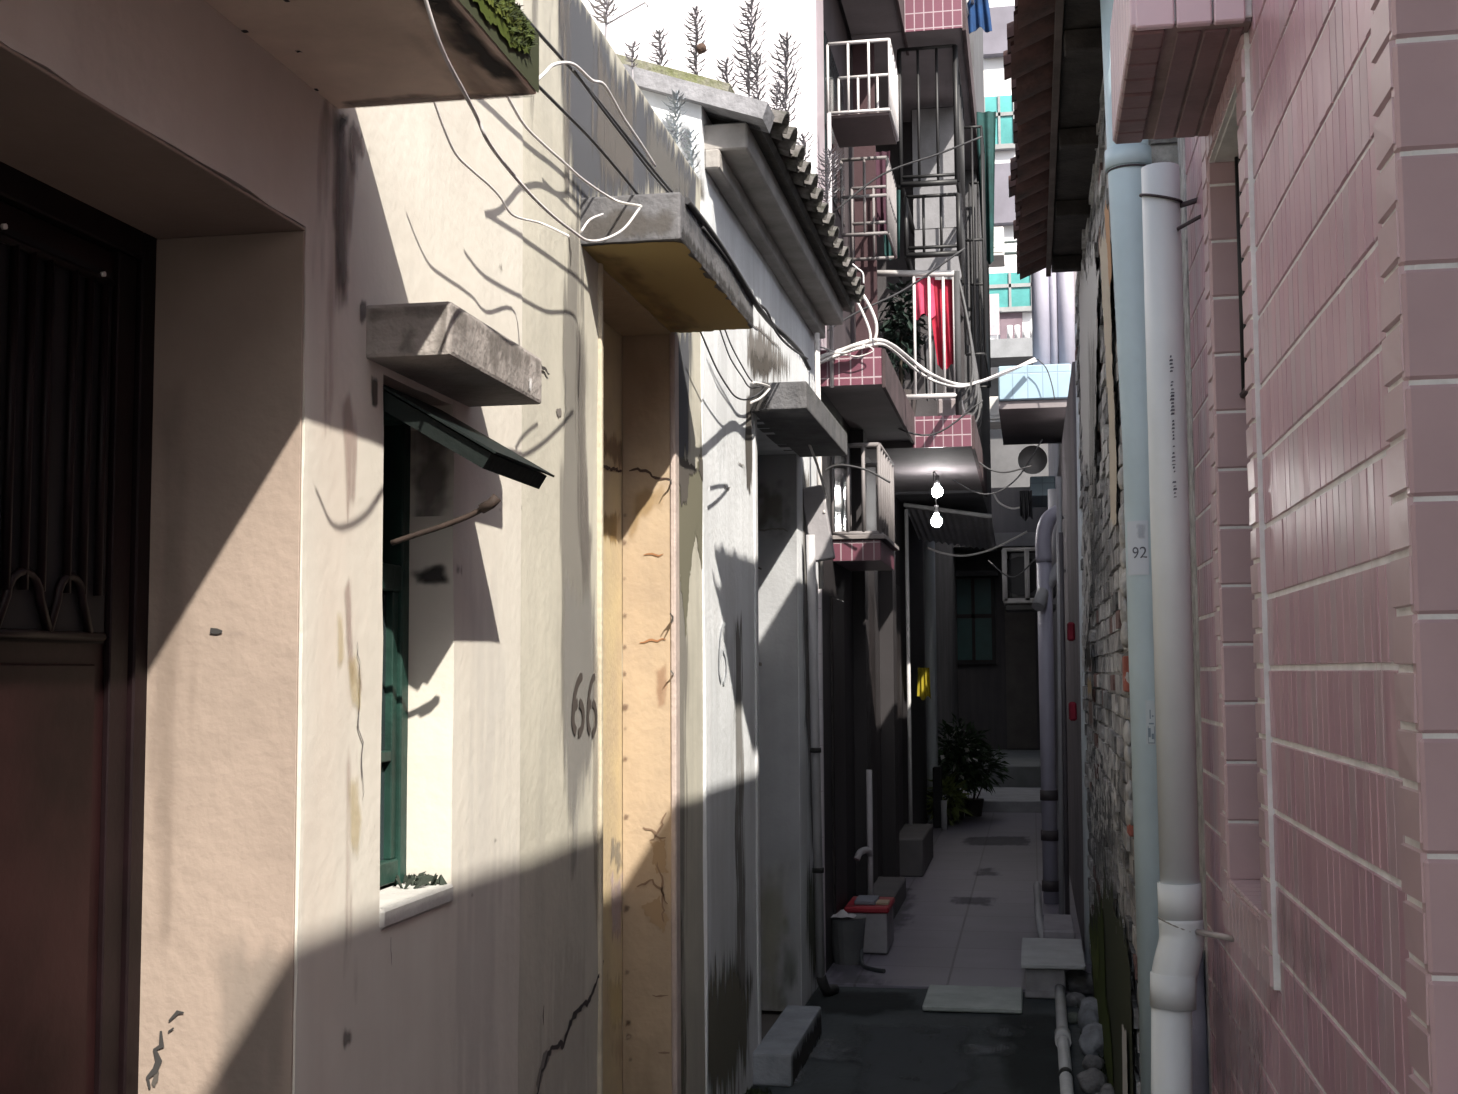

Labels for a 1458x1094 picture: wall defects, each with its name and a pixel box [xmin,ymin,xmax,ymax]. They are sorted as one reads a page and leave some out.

damp [334,0,526,321]
crack [603,465,672,484]
damp [559,0,788,823]
crack [637,813,668,922]
damp [708,617,751,1094]
crack [146,1010,184,1089]
crack [537,960,604,1094]